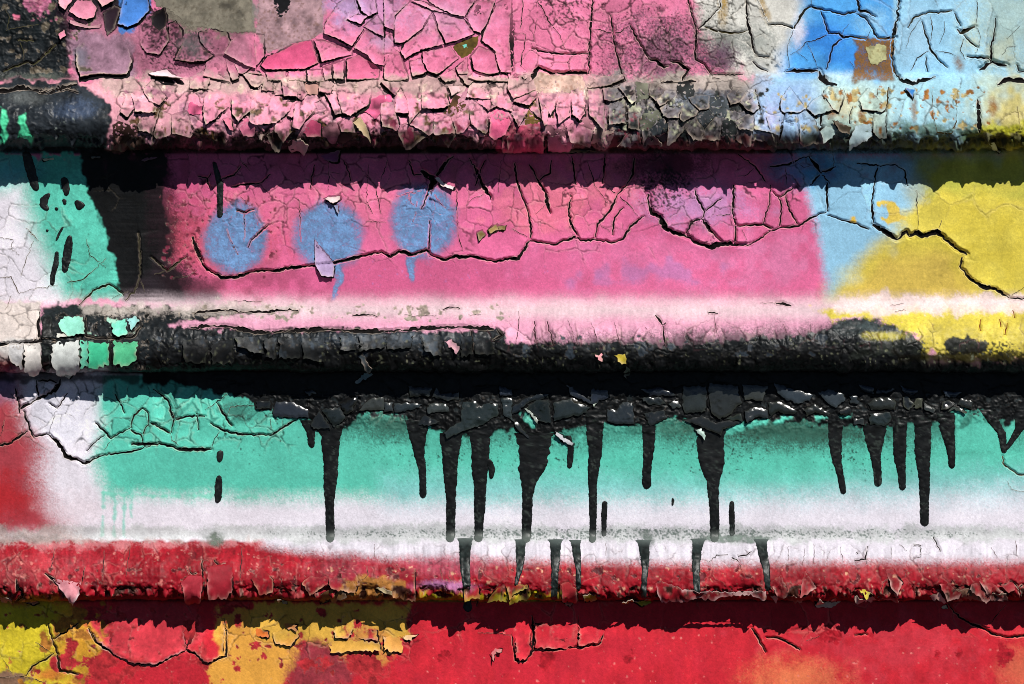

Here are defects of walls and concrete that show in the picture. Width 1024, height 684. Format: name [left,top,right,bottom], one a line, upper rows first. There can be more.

peeling [57,0,887,164]
crack [0,0,1024,360]
peeling [8,314,142,379]
peeling [254,334,974,446]
crack [0,378,297,466]
peeling [53,579,82,605]
peeling [180,563,234,605]
peeling [462,582,532,605]
peeling [621,570,841,608]
peeling [928,576,1017,609]
peeling [89,617,226,665]
peeling [328,622,419,654]